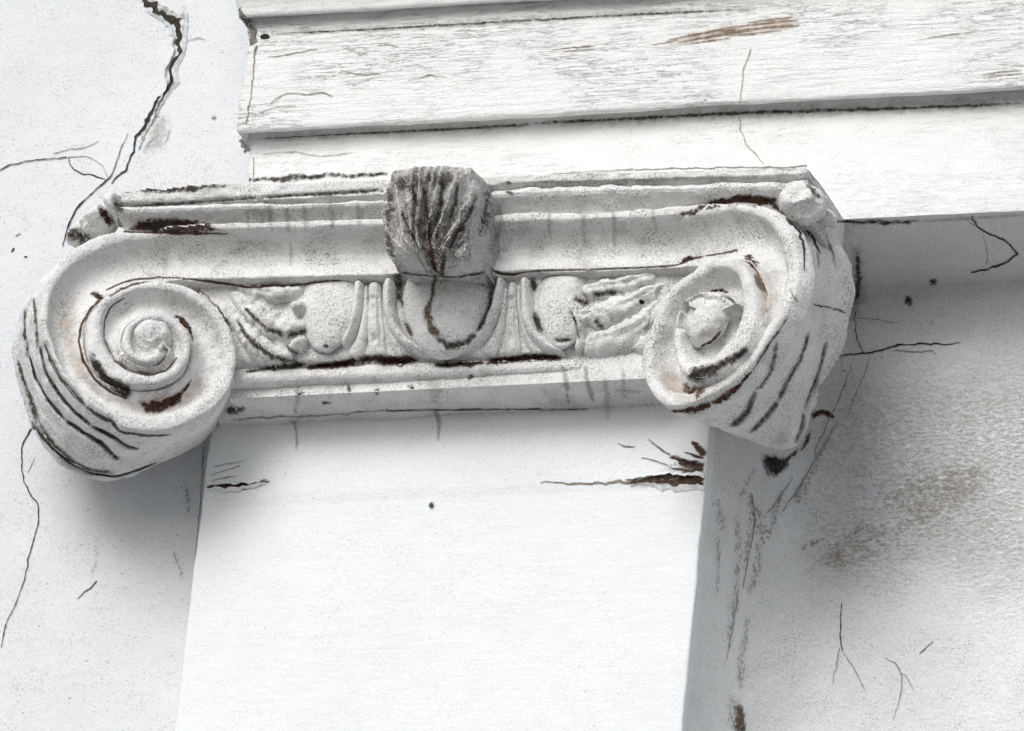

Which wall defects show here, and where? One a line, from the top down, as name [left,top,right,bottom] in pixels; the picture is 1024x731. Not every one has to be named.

crack [0,0,189,246]
crack [553,49,807,174]
corrosion [123,218,228,235]
crack [960,216,1018,273]
corrosion [140,380,192,413]
peeling [207,461,268,492]
peeling [540,439,706,492]
crack [1,428,39,646]
crack [833,603,865,690]
crack [885,657,913,719]